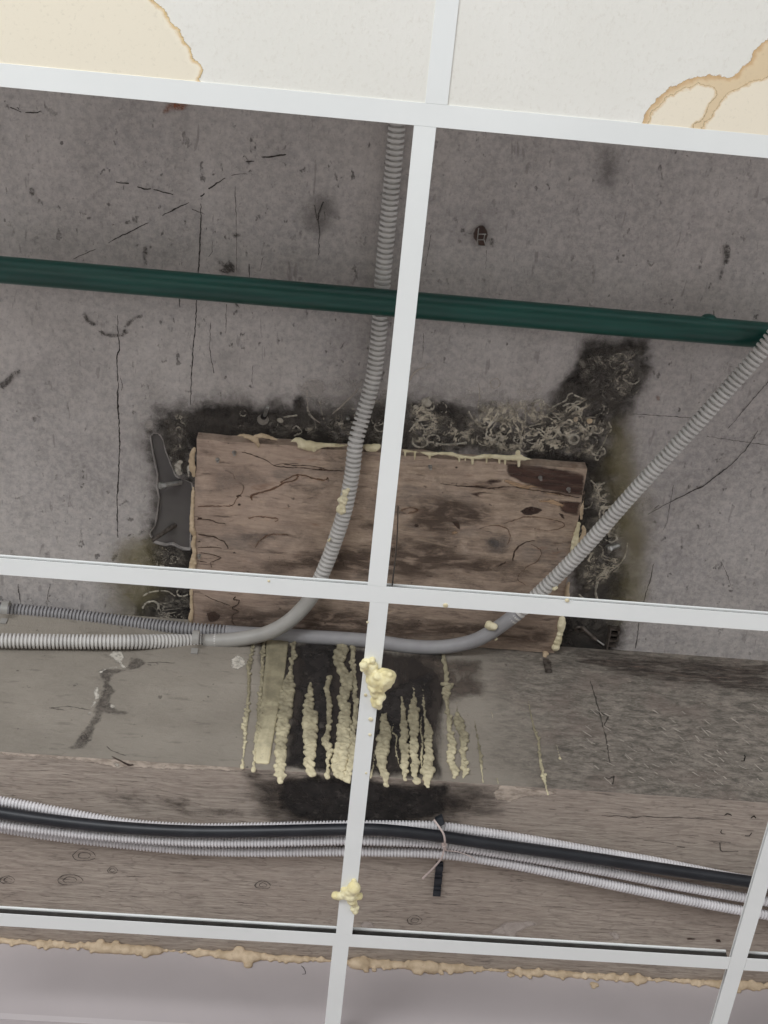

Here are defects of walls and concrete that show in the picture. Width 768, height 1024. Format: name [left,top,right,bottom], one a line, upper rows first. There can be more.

damp [0,0,203,82]
damp [643,40,768,135]
crack [179,299,227,405]
crack [115,316,123,537]
damp [146,397,386,507]
damp [401,339,651,538]
crack [649,382,768,530]
damp [119,583,191,619]
damp [122,492,193,568]
damp [332,550,371,570]
damp [560,616,620,650]
damp [574,505,642,602]